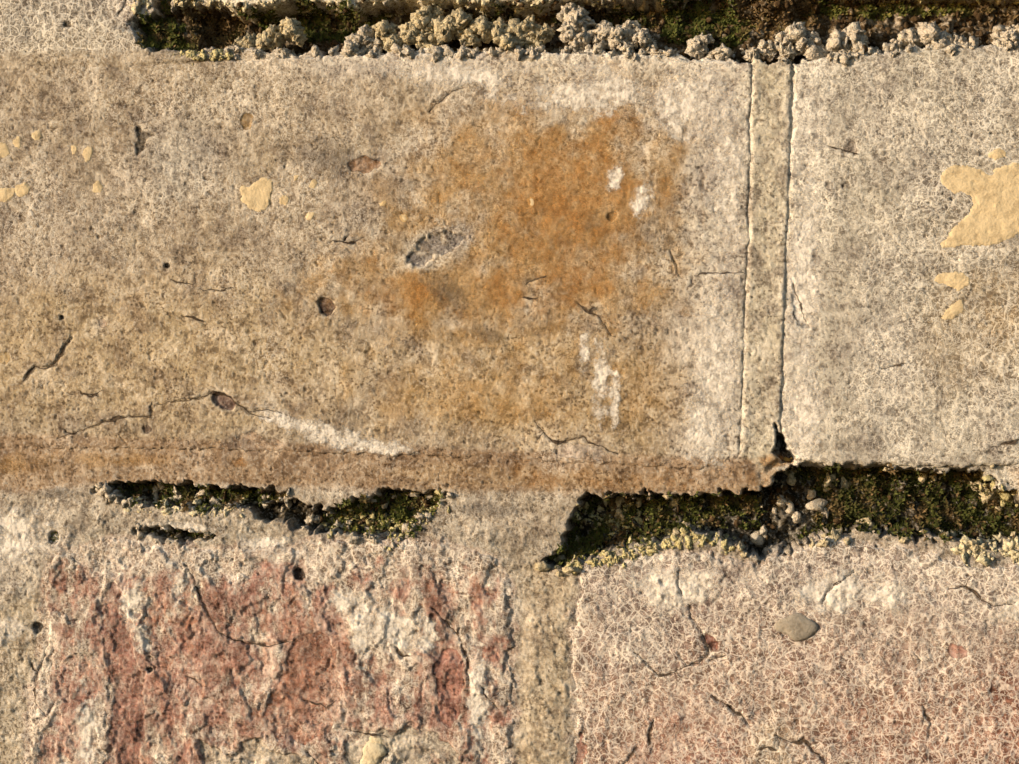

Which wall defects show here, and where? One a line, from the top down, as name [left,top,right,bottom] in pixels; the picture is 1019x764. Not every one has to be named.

spalling [408,231,465,266]
crack [23,338,72,382]
crack [57,390,282,439]
spalling [556,443,604,461]
crack [992,439,1019,447]